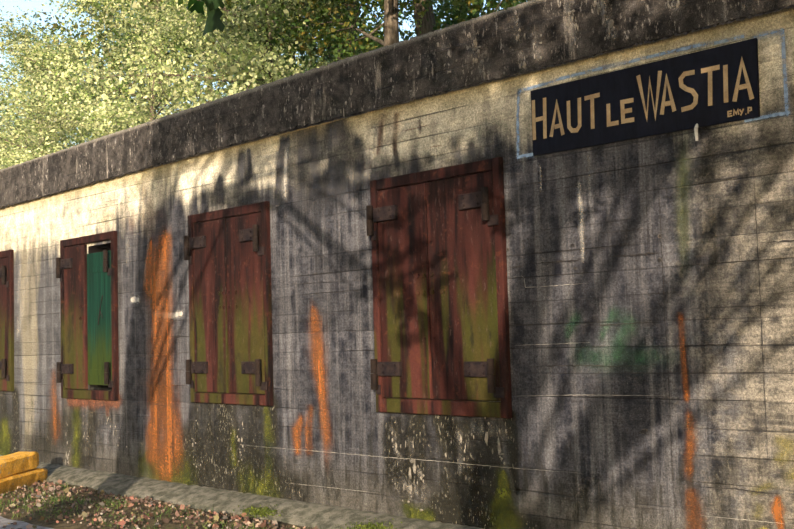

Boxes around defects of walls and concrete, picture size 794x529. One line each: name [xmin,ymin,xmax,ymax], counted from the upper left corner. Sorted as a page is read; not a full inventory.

rust [145,232,179,478]
rust [294,310,327,454]
rust [678,314,689,400]
rust [686,415,695,475]